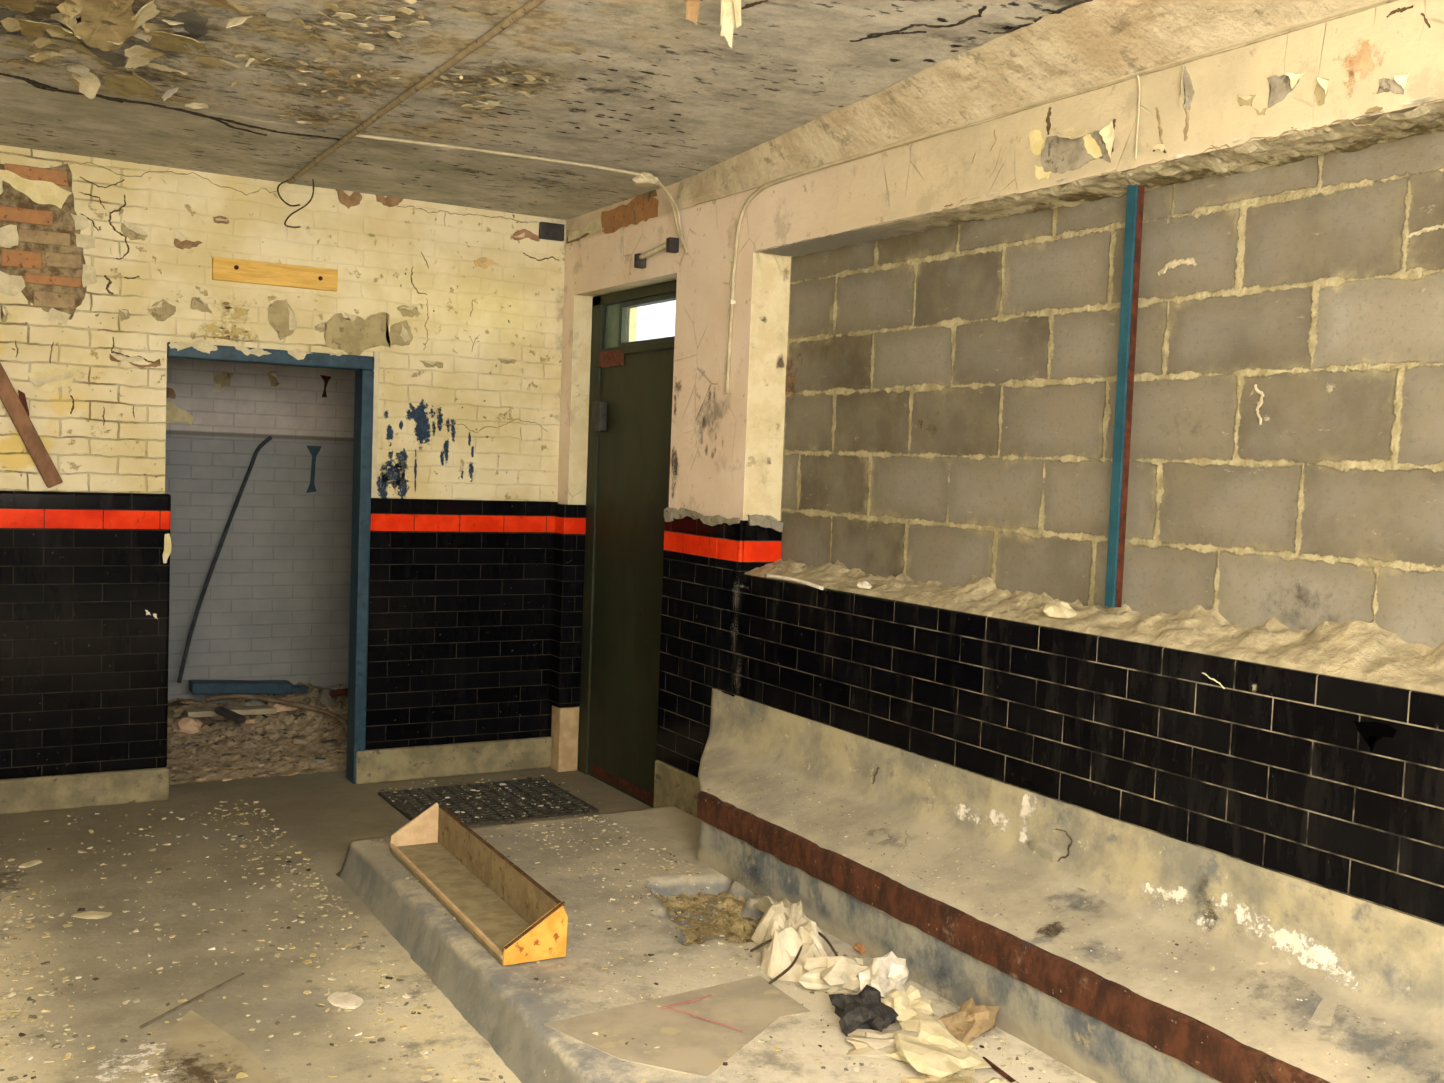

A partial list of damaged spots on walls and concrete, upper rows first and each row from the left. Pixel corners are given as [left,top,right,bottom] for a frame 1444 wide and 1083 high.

crack [0,73,340,140]
peeling [0,0,433,126]
crack [850,0,1093,42]
spalling [757,65,1444,273]
flaking render [0,163,97,325]
flaking render [567,190,659,244]
peeling [109,297,420,387]